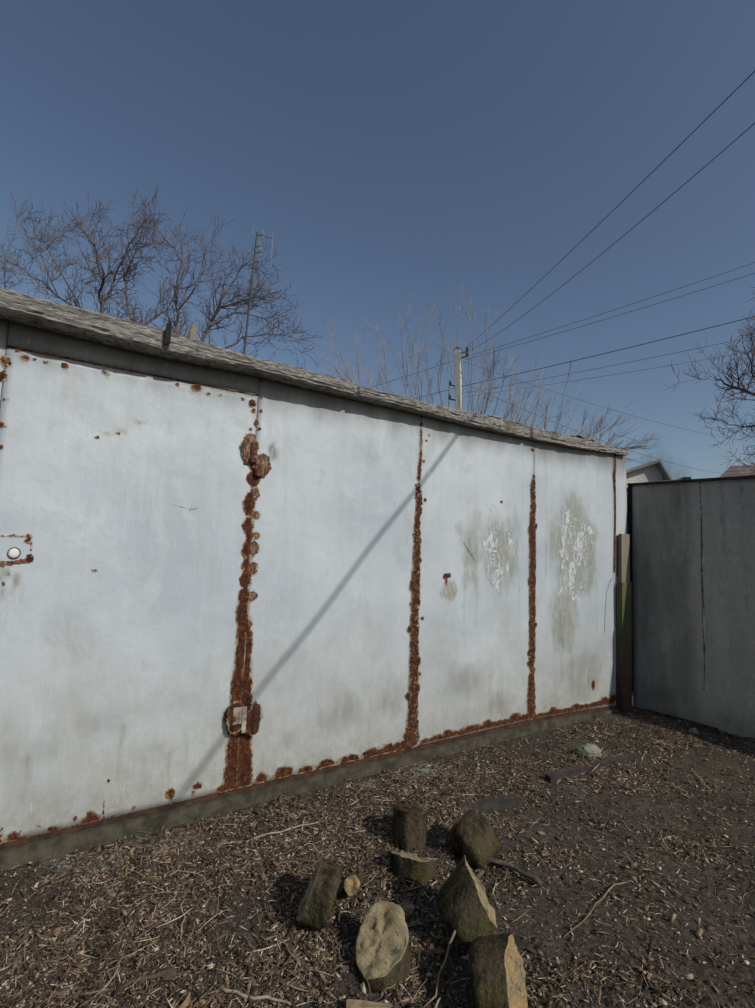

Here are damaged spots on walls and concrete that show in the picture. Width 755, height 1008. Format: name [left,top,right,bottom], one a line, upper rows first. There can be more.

corrosion [0,346,617,796]
corrosion [0,811,119,844]